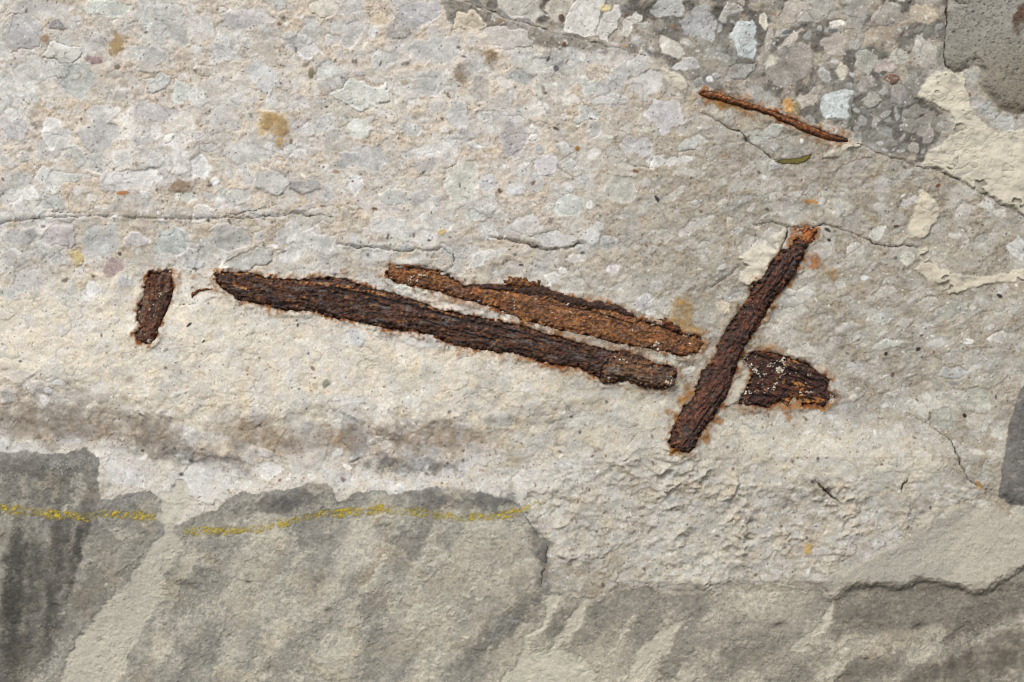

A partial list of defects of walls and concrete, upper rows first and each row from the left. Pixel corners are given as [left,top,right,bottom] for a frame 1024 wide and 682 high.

spalling [564,0,606,38]
spalling [765,42,814,89]
spalling [643,98,689,136]
crack [705,114,812,164]
corrosion [698,86,850,146]
spalling [100,168,163,193]
spalling [223,248,274,273]
peeling [739,227,787,286]
corrosion [130,268,176,348]
spalling [778,287,815,309]
corrosion [210,224,835,455]
spalling [179,457,231,506]